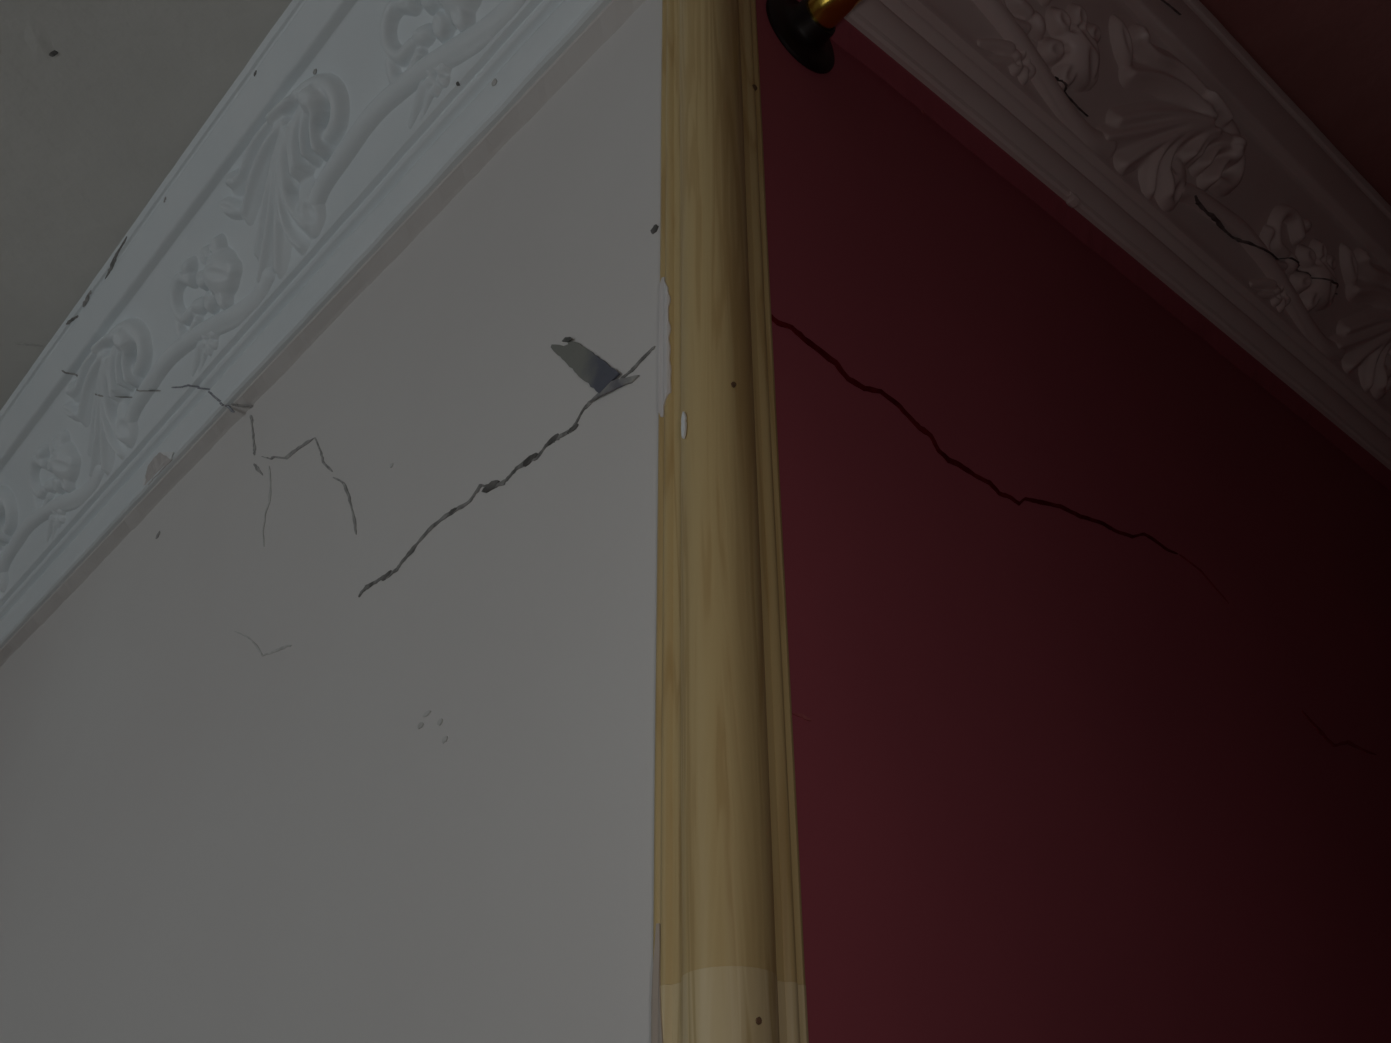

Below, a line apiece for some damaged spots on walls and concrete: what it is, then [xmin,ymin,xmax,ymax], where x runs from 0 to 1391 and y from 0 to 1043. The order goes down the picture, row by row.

crack [66,236,127,325]
crack [1194,195,1339,294]
crack [61,370,357,547]
crack [358,346,656,597]
crack [771,314,1229,604]